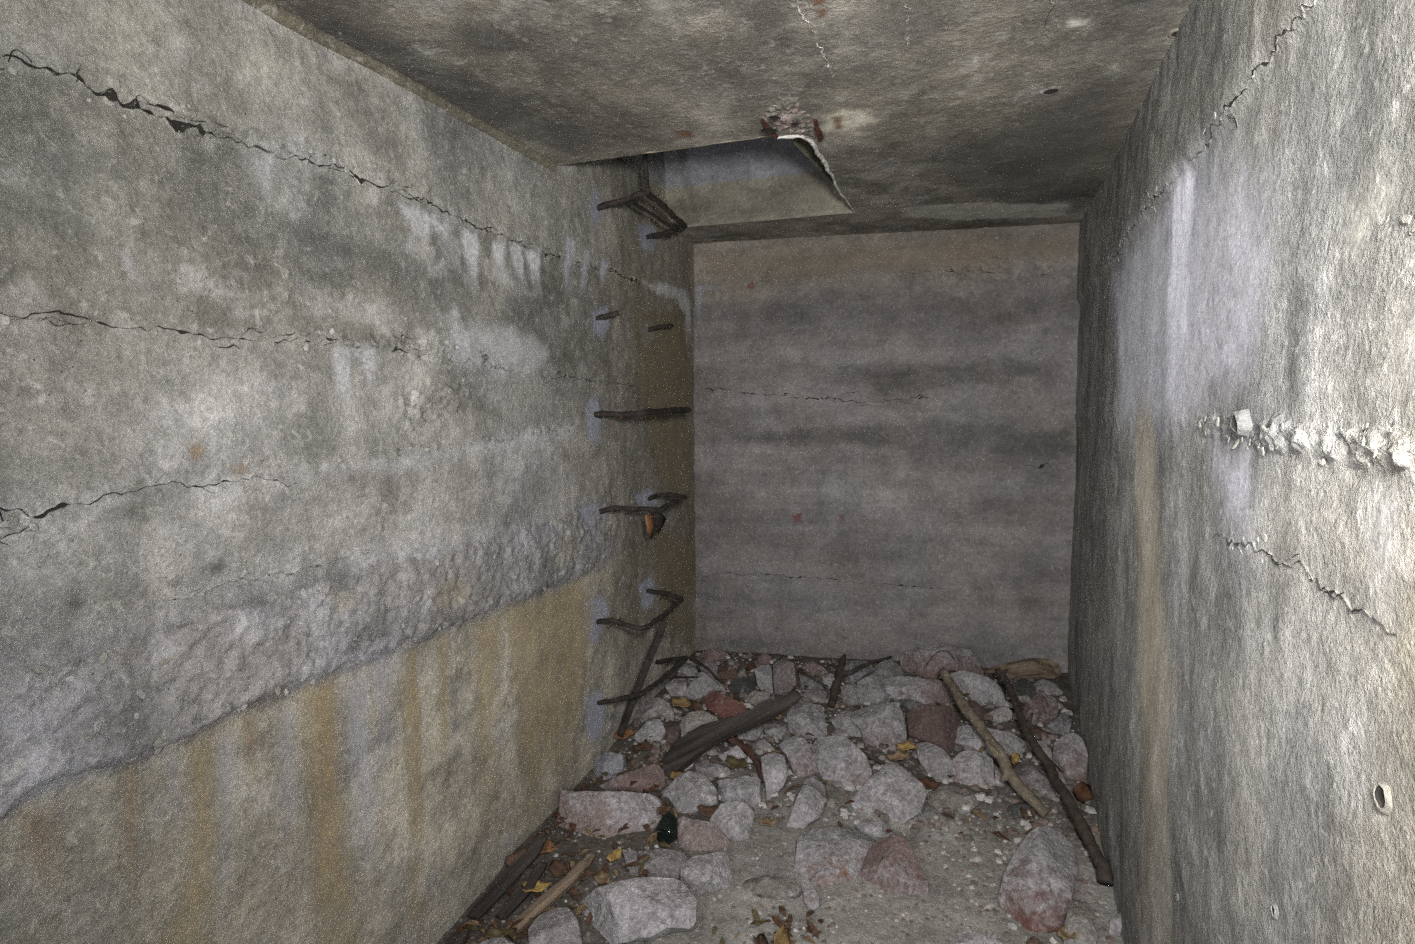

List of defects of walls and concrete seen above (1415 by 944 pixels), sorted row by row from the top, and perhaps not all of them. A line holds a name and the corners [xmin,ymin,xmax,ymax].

crack [0,49,641,285]
spalling [760,97,855,214]
crack [1110,0,1316,264]
crack [0,310,929,407]
crack [0,472,297,549]
rust [645,511,666,540]
crack [1212,533,1396,635]